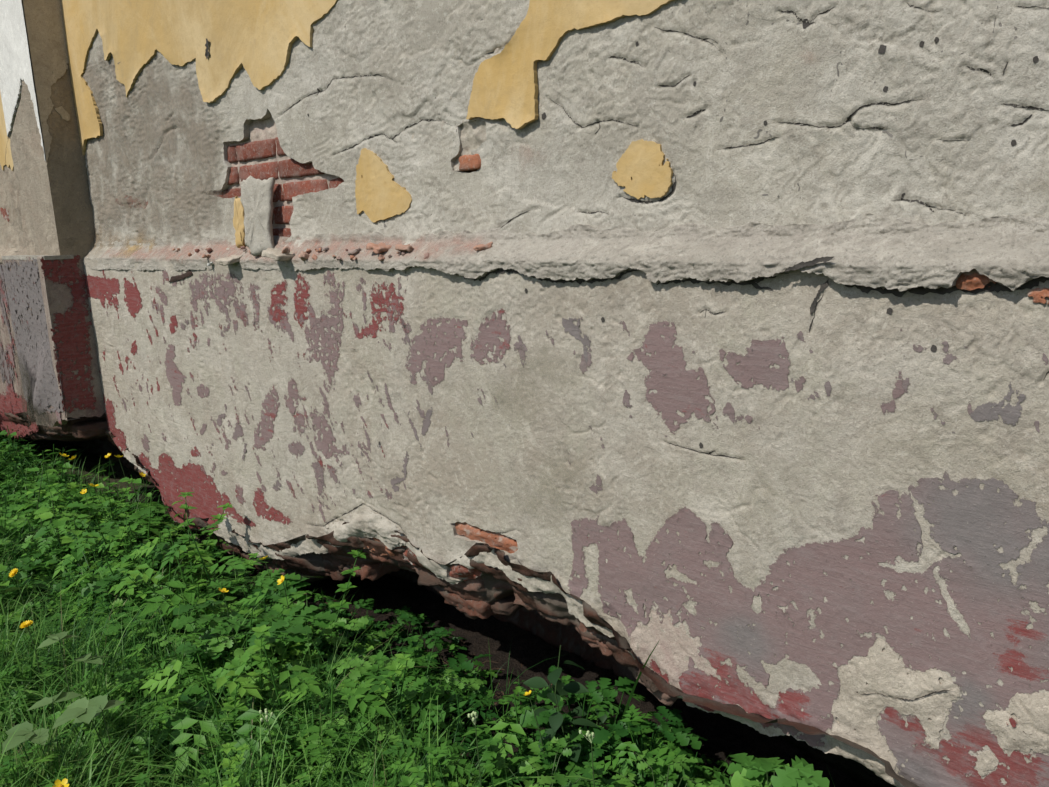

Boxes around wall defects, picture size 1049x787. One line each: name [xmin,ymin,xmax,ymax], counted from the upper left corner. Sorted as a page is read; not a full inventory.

crack [283,12,393,113]
crack [333,40,457,155]
crack [655,0,834,59]
crack [686,51,961,160]
crack [928,6,1049,76]
crack [1005,104,1049,126]
crack [562,173,676,216]
crack [892,180,963,214]
peeling [0,0,1049,531]
crack [455,256,1049,332]
peeling [567,471,1049,787]
crack [858,690,950,701]